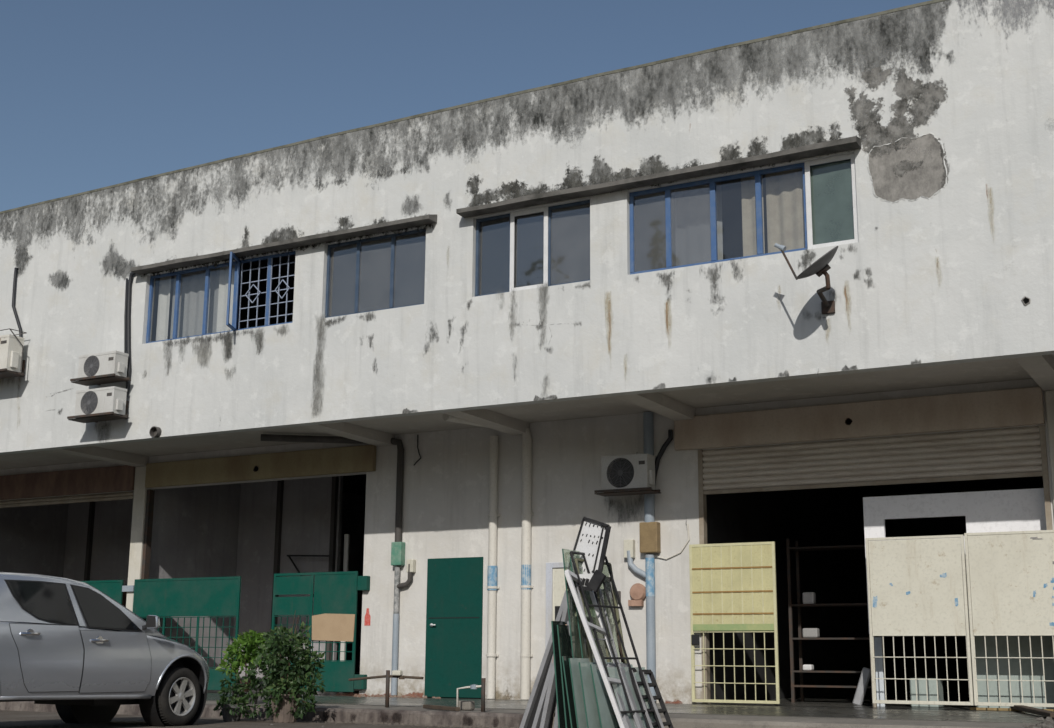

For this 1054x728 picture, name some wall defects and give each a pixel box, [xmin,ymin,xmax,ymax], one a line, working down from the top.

leakage [0,0,1054,279]
peeling [844,66,949,204]
leakage [50,272,69,289]
leakage [708,262,738,303]
leakage [168,330,263,370]
leakage [313,317,345,415]
leakage [537,284,550,350]